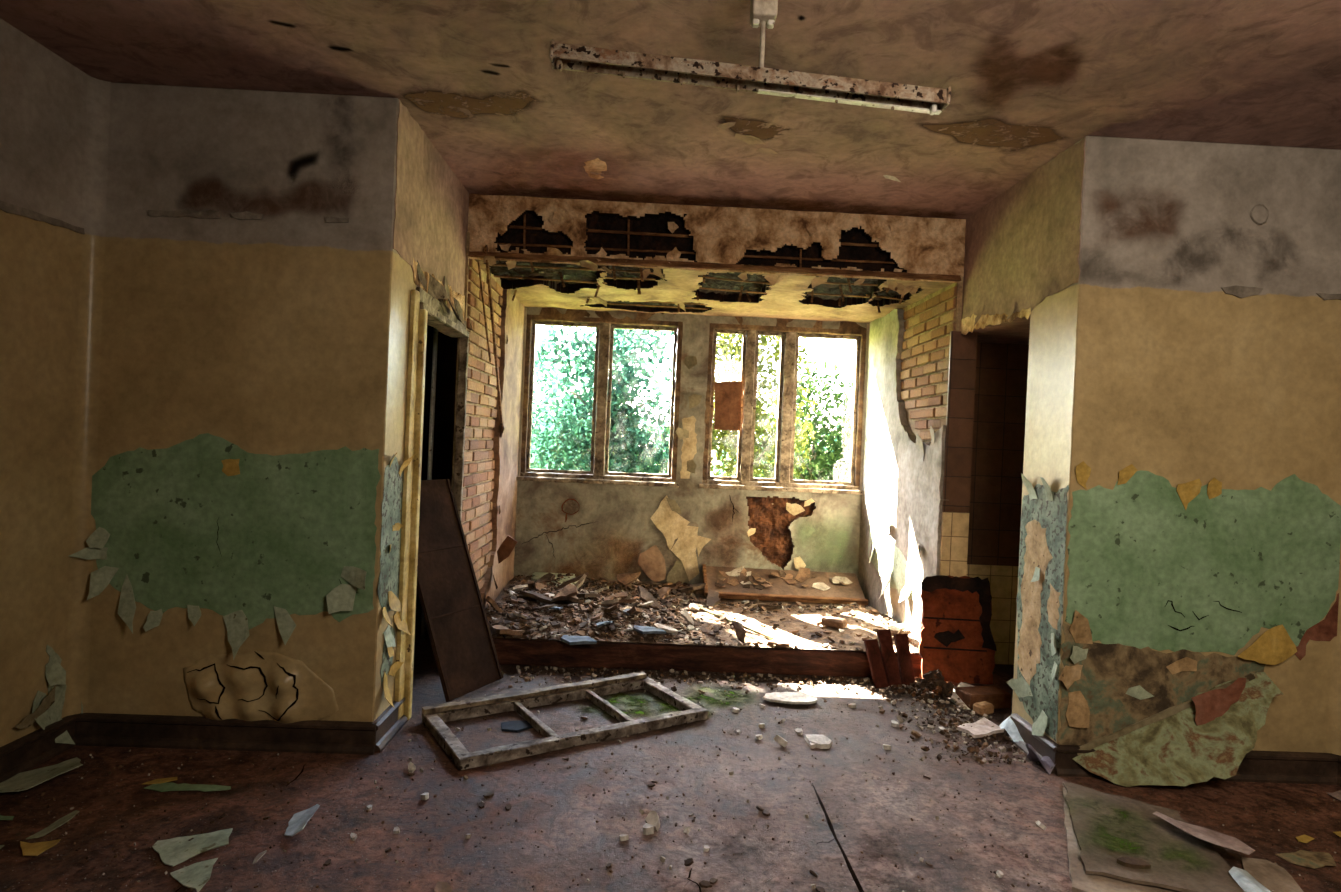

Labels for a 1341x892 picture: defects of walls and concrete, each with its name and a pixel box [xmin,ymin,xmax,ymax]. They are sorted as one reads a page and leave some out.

damp [980,44,1080,101]
spalling [413,210,1031,607]